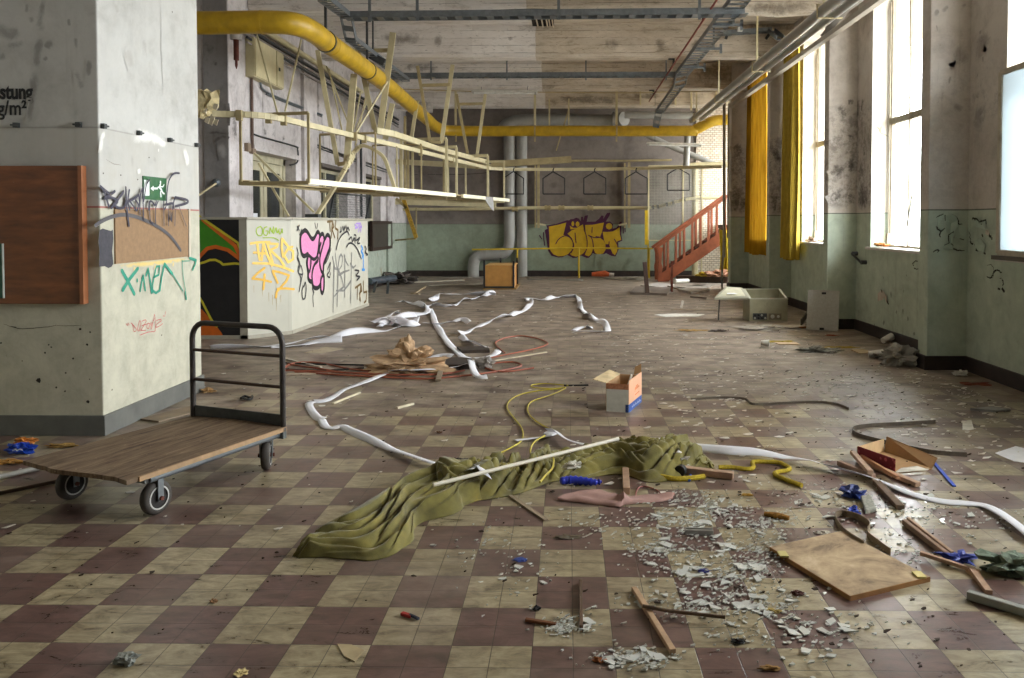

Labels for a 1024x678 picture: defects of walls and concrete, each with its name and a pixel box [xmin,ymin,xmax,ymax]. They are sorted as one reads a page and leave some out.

mould [836,95,865,120]
mould [825,133,870,214]